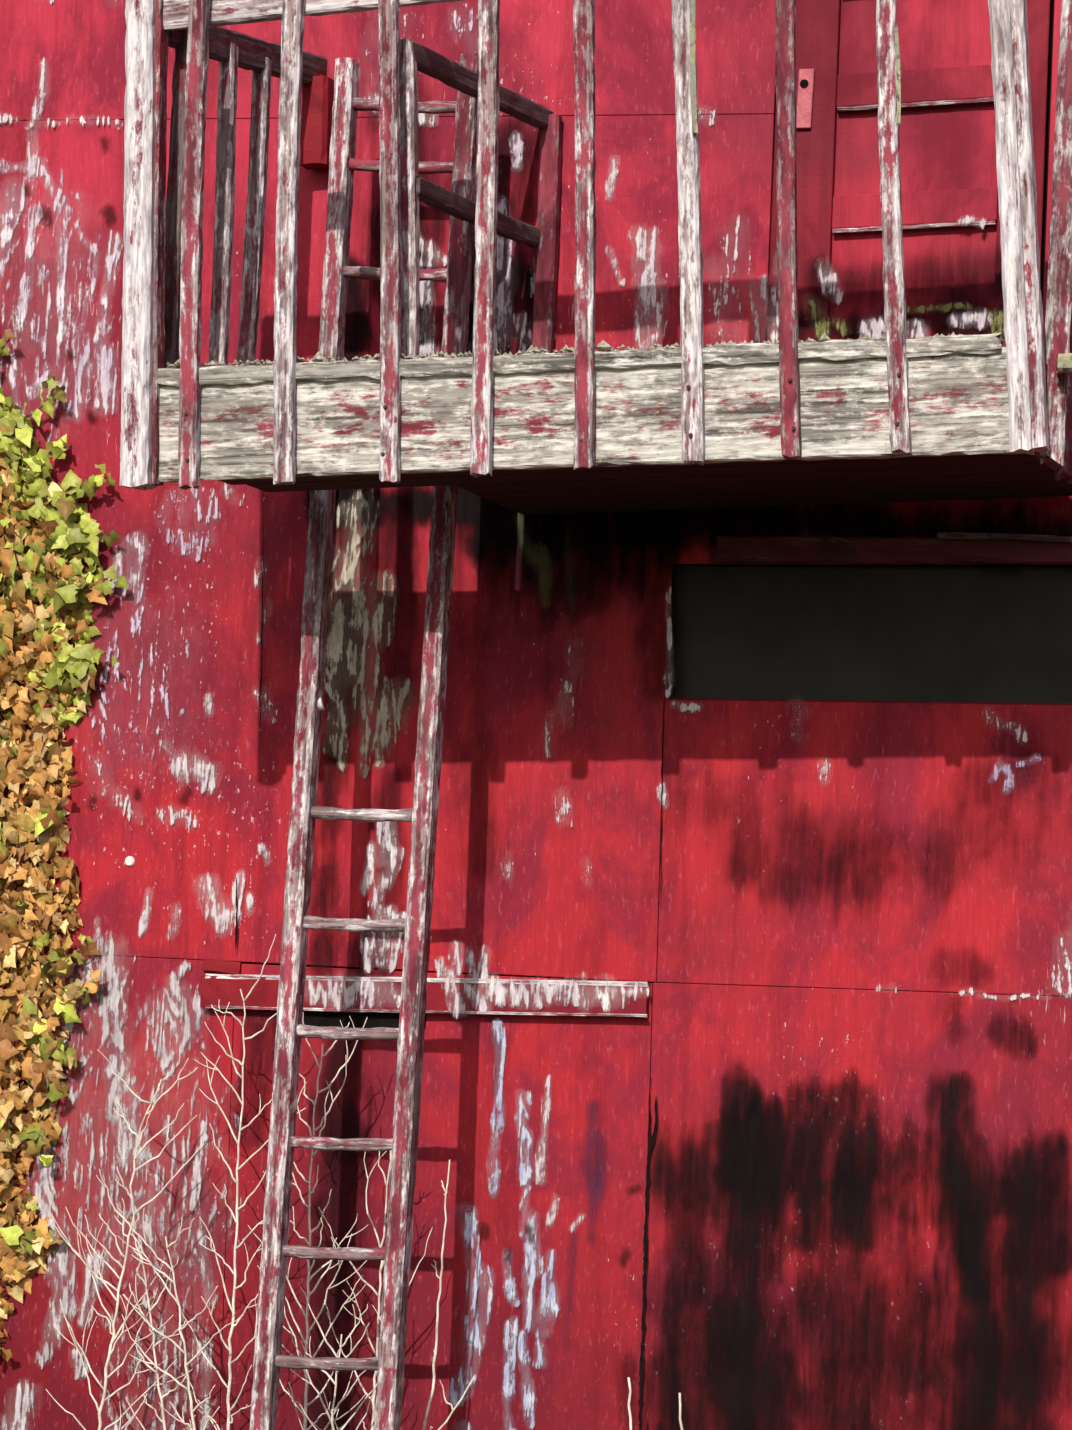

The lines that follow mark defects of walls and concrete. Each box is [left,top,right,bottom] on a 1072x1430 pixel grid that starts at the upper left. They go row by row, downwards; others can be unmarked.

peeling [0,58,123,419]
peeling [605,160,618,201]
peeling [606,227,667,349]
peeling [323,489,410,778]
peeling [138,893,149,938]
peeling [199,872,254,935]
peeling [959,938,1072,1001]
peeling [28,928,241,1430]
peeling [435,942,649,1430]
damp [656,1073,1072,1430]
peeling [2,1380,34,1430]